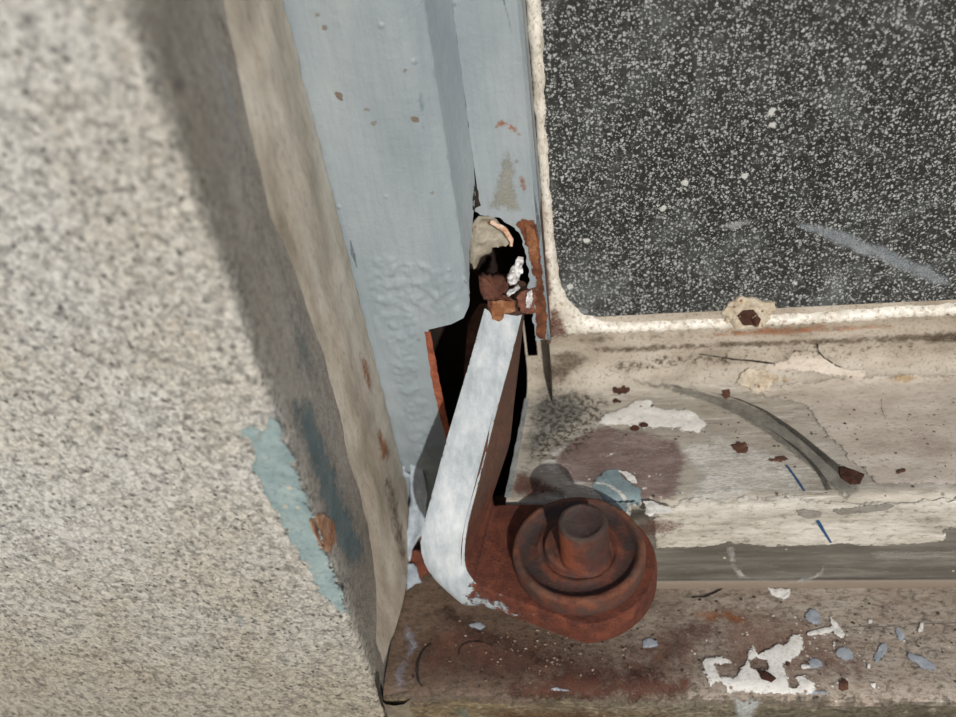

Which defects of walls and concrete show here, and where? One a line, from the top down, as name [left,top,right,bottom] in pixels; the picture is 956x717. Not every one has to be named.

peeling [596,399,707,433]
spalling [309,514,337,553]
corrosion [640,520,680,537]
corrosion [406,549,429,590]
peeling [702,617,845,695]